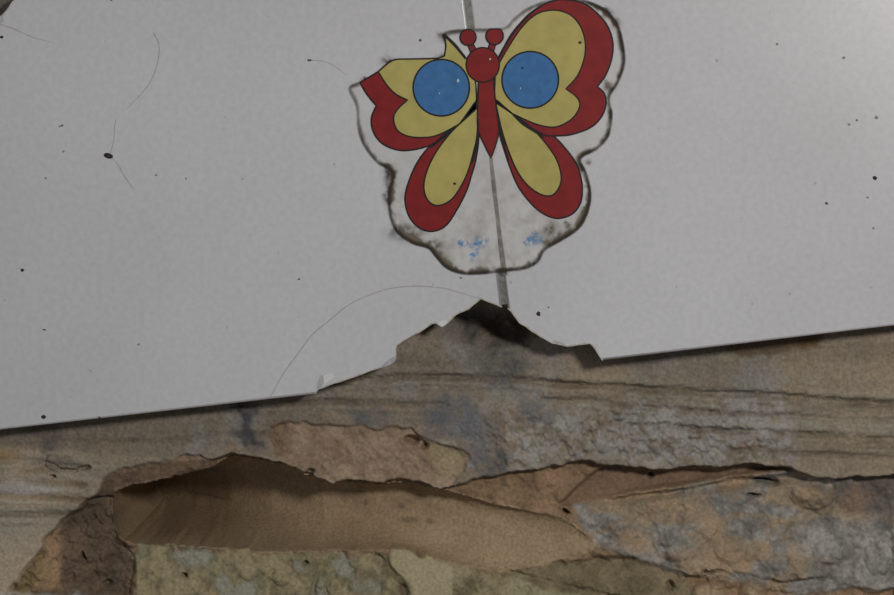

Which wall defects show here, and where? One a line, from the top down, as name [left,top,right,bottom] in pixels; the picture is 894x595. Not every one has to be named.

spalling [7,418,894,595]